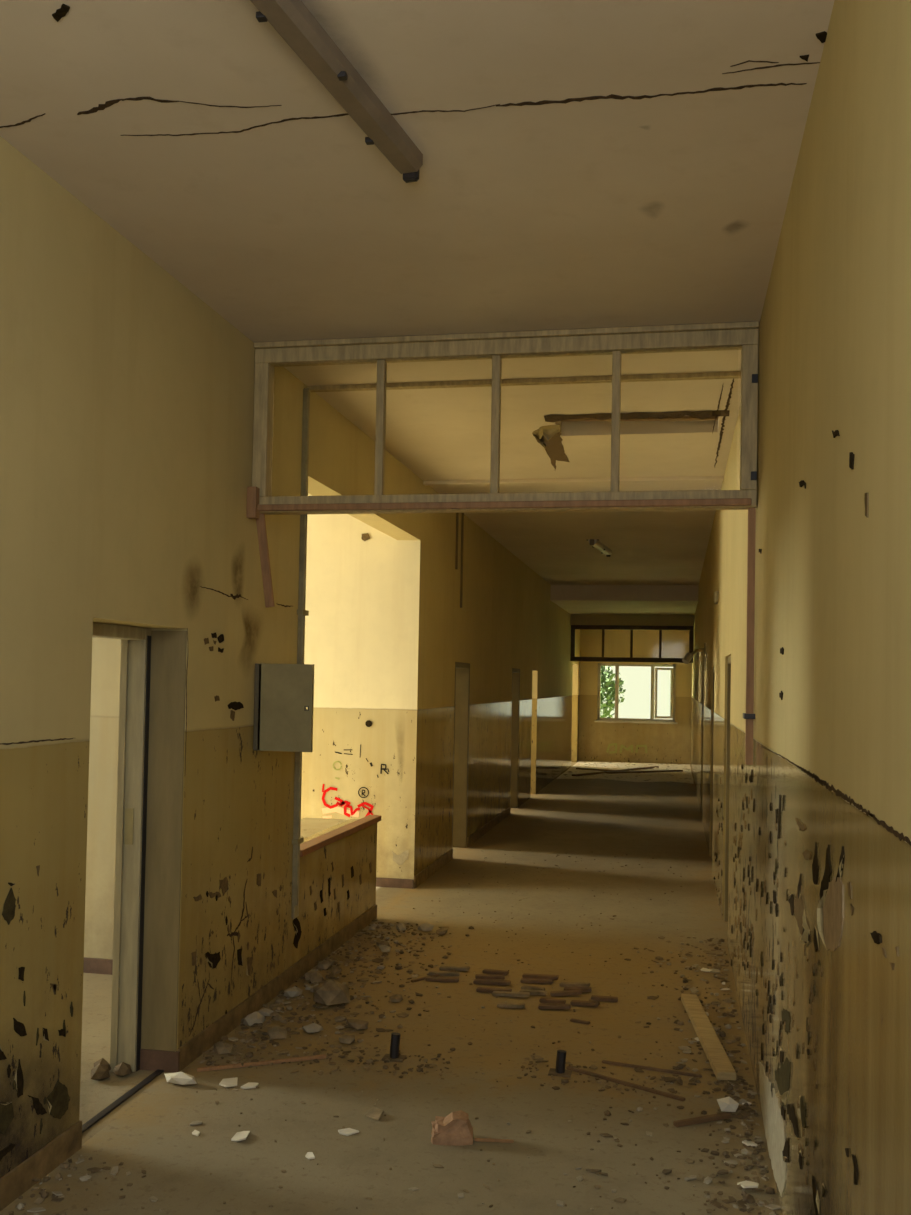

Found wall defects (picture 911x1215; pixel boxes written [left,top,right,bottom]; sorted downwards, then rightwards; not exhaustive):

crack [390,60,820,115]
crack [0,113,45,128]
crack [77,97,349,136]
peeling [532,424,570,469]
crack [0,737,73,745]
crack [760,746,911,846]
peeling [2,882,16,925]
peeling [310,862,372,916]
peeling [191,877,262,988]
peeling [713,764,854,1215]
peeling [13,1002,73,1046]
peeling [0,1046,69,1161]